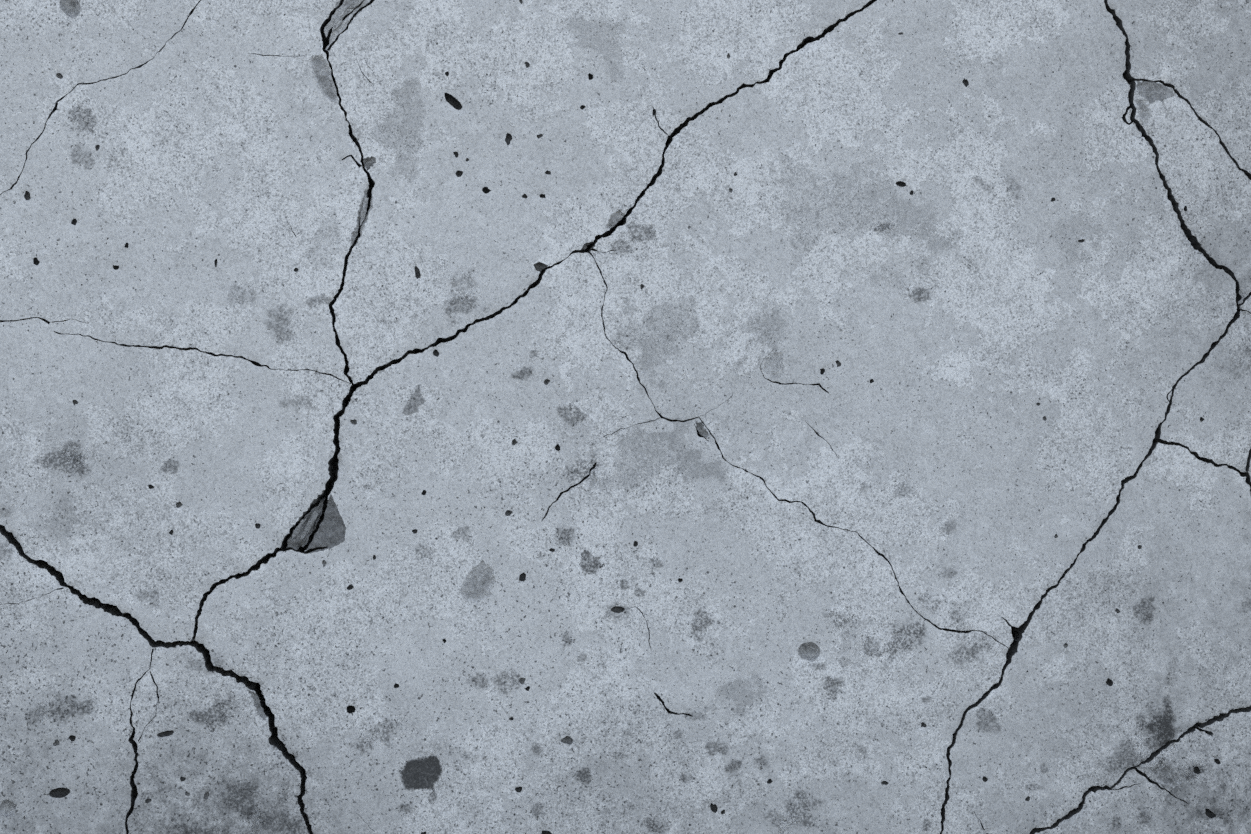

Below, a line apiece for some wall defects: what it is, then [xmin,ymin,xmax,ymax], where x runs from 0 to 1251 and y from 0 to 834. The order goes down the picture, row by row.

spalling [286,490,346,567]
crack [0,0,877,834]
crack [588,0,1251,834]